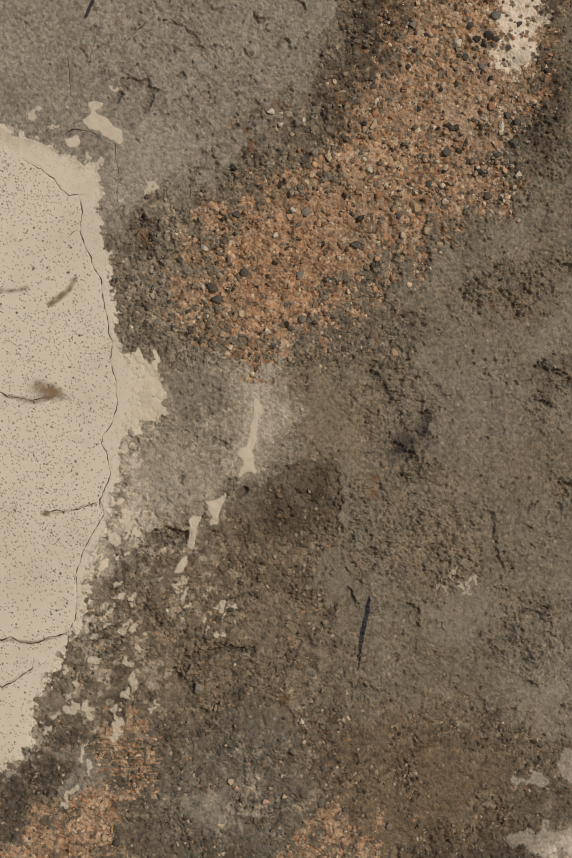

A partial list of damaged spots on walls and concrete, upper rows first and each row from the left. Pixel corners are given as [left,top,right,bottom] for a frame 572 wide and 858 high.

peeling [82,101,123,144]
peeling [64,135,105,171]
crack [65,129,119,199]
spalling [103,0,572,477]
crack [0,164,118,688]
peeling [171,493,227,609]
peeling [436,567,478,595]
peeling [213,600,237,619]
flaking render [510,769,551,788]
flaking render [556,748,572,783]
spalling [277,782,387,858]
flaking render [505,818,572,858]